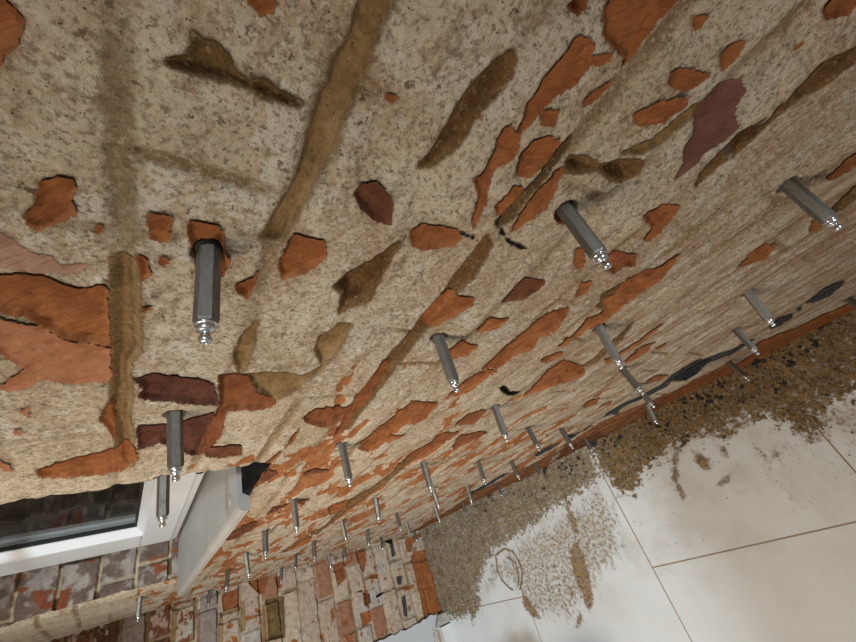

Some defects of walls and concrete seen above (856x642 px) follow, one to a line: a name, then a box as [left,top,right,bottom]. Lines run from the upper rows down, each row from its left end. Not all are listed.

spalling [472,0,680,236]
spalling [354,182,394,225]
spalling [0,273,113,393]
spalling [277,234,327,280]
spalling [501,278,546,303]
spalling [524,248,682,395]
spalling [36,397,167,479]
spalling [132,372,276,459]
spalling [260,359,389,481]
spalling [358,400,438,453]
spalling [397,303,855,642]
spalling [245,576,297,642]